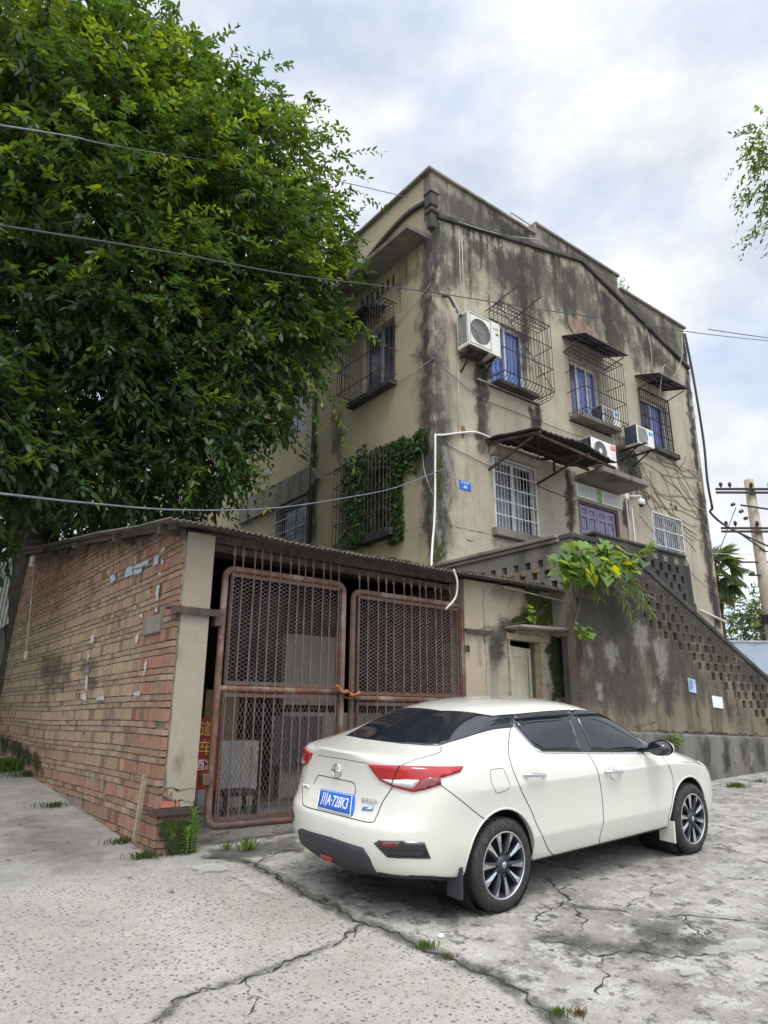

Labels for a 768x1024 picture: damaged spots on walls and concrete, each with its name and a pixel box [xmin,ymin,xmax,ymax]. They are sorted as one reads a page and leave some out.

leakage [452,224,575,371]
leakage [419,231,450,560]
leakage [569,277,767,717]
peeling [107,547,165,618]
flaking render [154,790,194,856]
leakage [703,740,765,771]